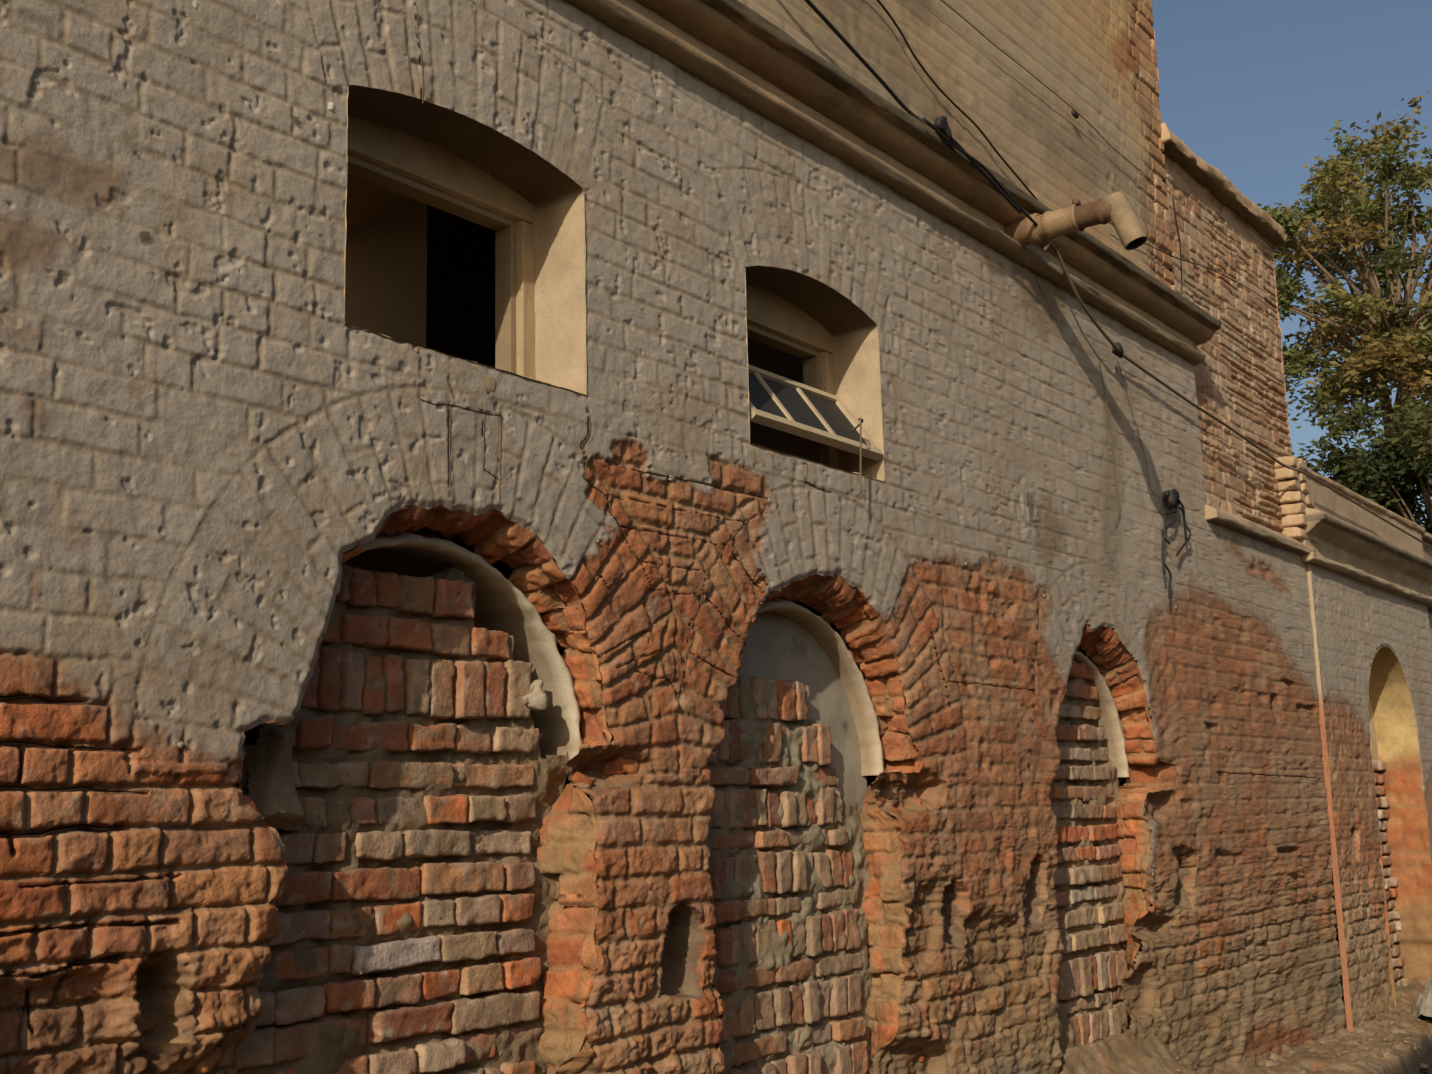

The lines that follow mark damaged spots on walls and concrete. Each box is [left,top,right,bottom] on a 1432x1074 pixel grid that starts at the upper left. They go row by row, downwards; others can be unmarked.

crack [581,405,771,697]
peeling [0,440,1394,1074]
peeling [1424,763,1432,883]